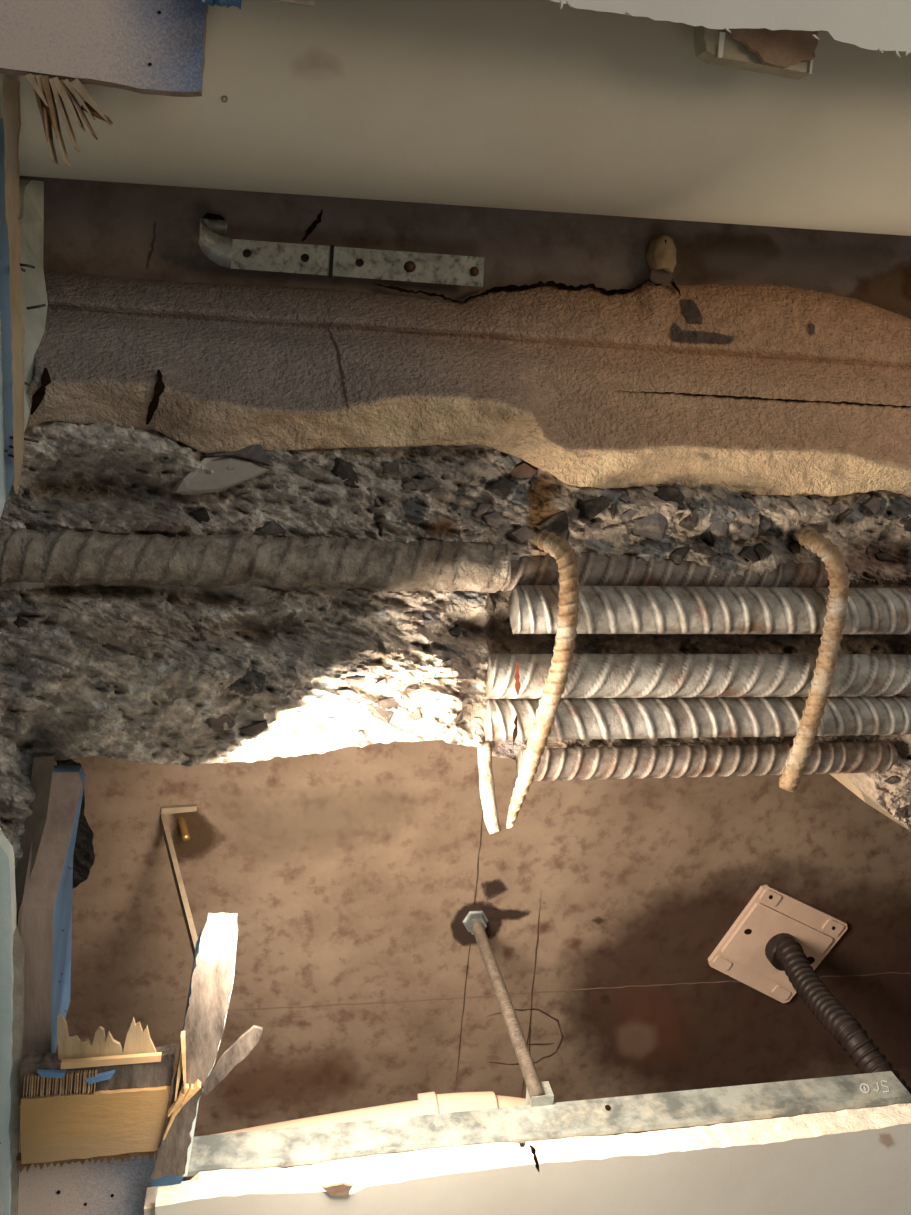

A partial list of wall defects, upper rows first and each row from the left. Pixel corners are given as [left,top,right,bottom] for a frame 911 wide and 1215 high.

crack [375,279,681,303]
leakage [850,264,911,319]
crack [615,390,911,408]
spalling [0,421,911,589]
spalling [573,634,823,654]
spalling [838,634,911,655]
spalling [0,581,557,868]
spalling [544,736,796,748]
spalling [815,734,911,830]